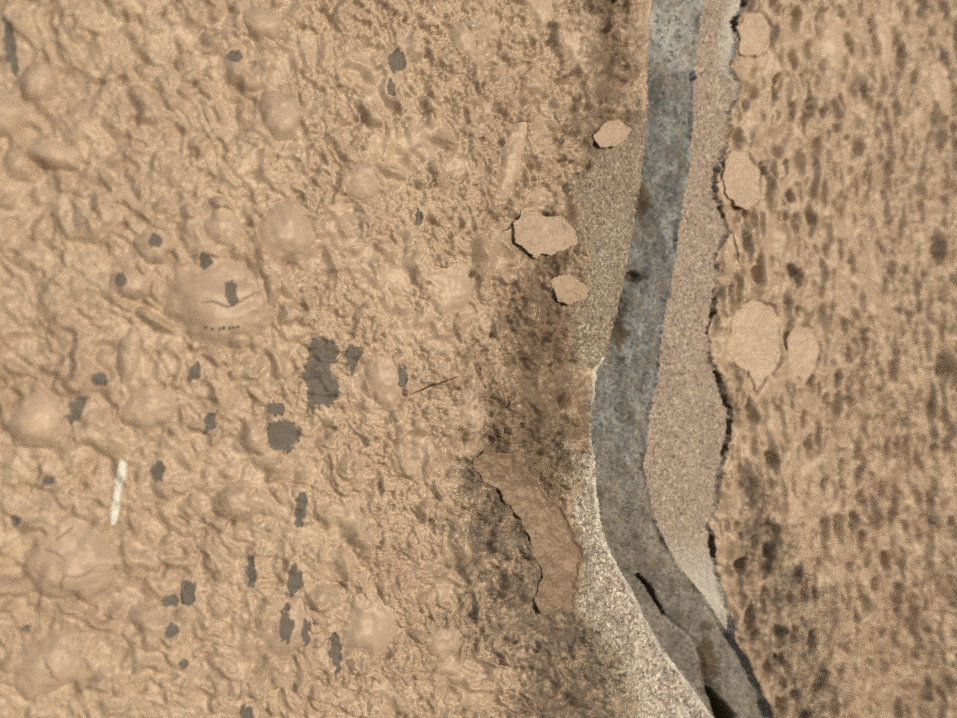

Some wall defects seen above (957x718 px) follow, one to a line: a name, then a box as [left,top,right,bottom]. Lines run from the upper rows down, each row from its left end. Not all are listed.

flaking render [512,104,649,369]
crack [586,0,774,718]
flaking render [643,0,771,637]
flaking render [727,300,820,390]
flaking render [472,451,709,718]